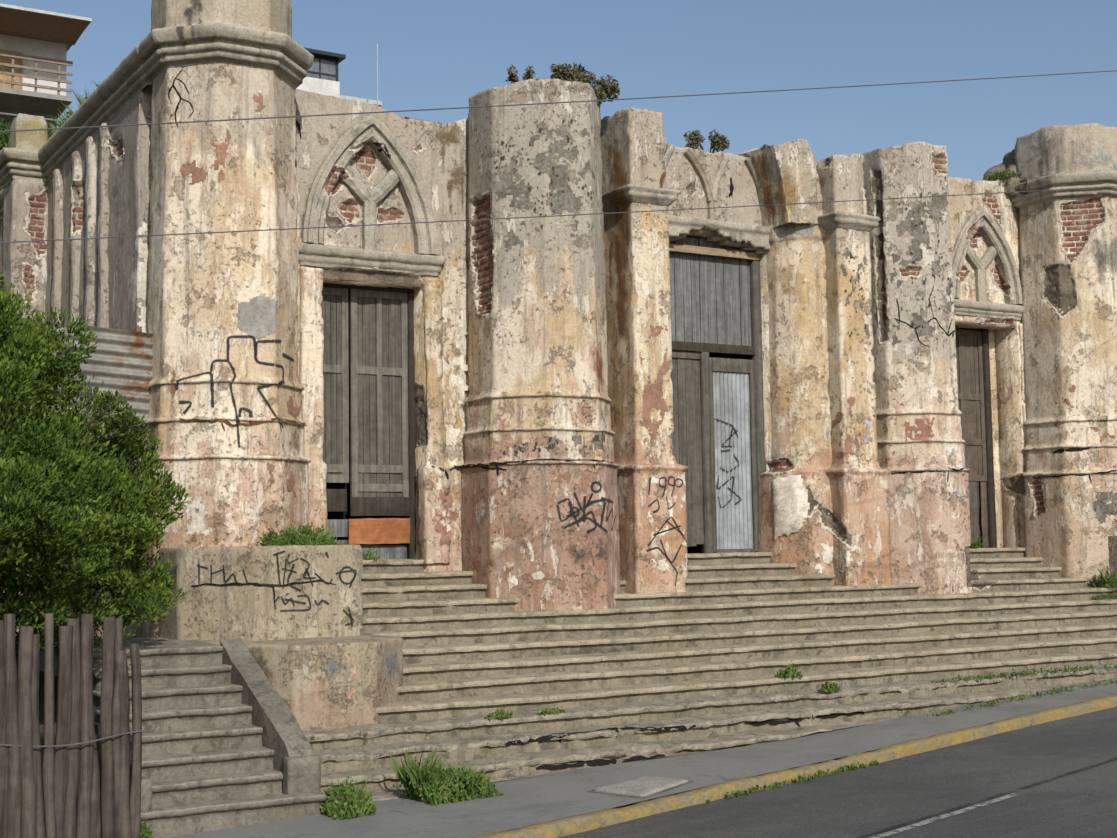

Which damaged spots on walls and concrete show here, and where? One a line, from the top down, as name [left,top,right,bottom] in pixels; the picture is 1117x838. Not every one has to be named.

crack [168,69,194,128]
flaking render [21,187,48,304]
flaking render [70,175,84,239]
peeling [180,129,231,184]
flaking render [322,138,407,235]
flaking render [442,117,595,451]
flaking render [841,167,1006,347]
crack [894,286,956,348]
flaking render [1042,192,1108,319]
flaking render [414,381,428,448]
flaking render [803,483,863,574]
flaking render [1093,490,1117,524]